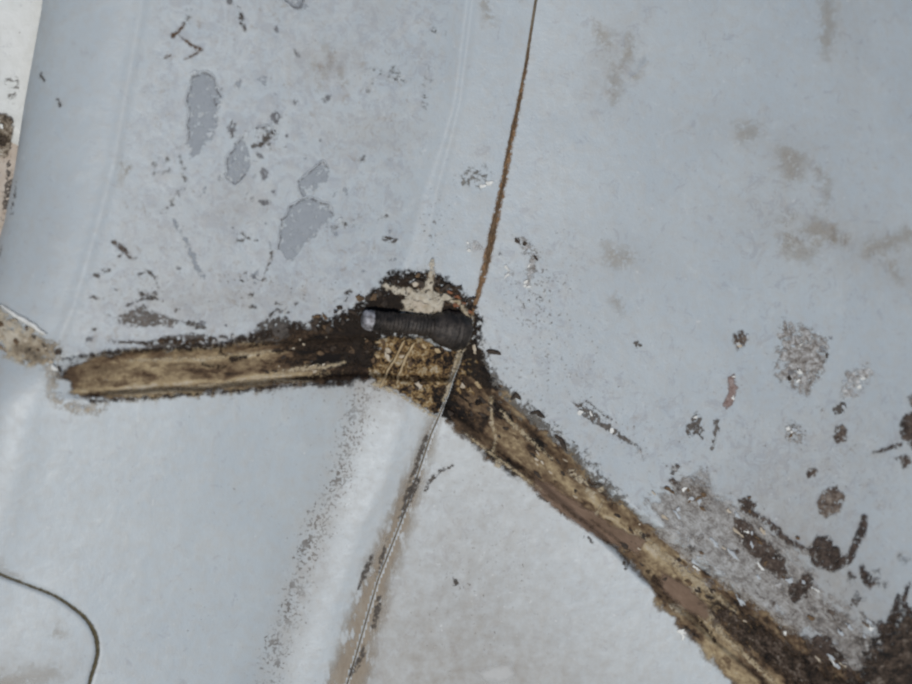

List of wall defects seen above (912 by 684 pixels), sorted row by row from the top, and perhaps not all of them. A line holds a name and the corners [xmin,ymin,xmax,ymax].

peeling [184,70,287,187]
peeling [276,160,342,261]
peeling [0,305,62,372]
corrosion [56,270,430,402]
corrosion [368,82,912,684]
peeling [723,374,738,409]
peeling [775,322,832,396]
peeling [686,414,720,450]
peeling [833,425,847,443]
peeling [873,397,912,469]
peeling [738,497,757,513]
peeling [817,487,845,518]